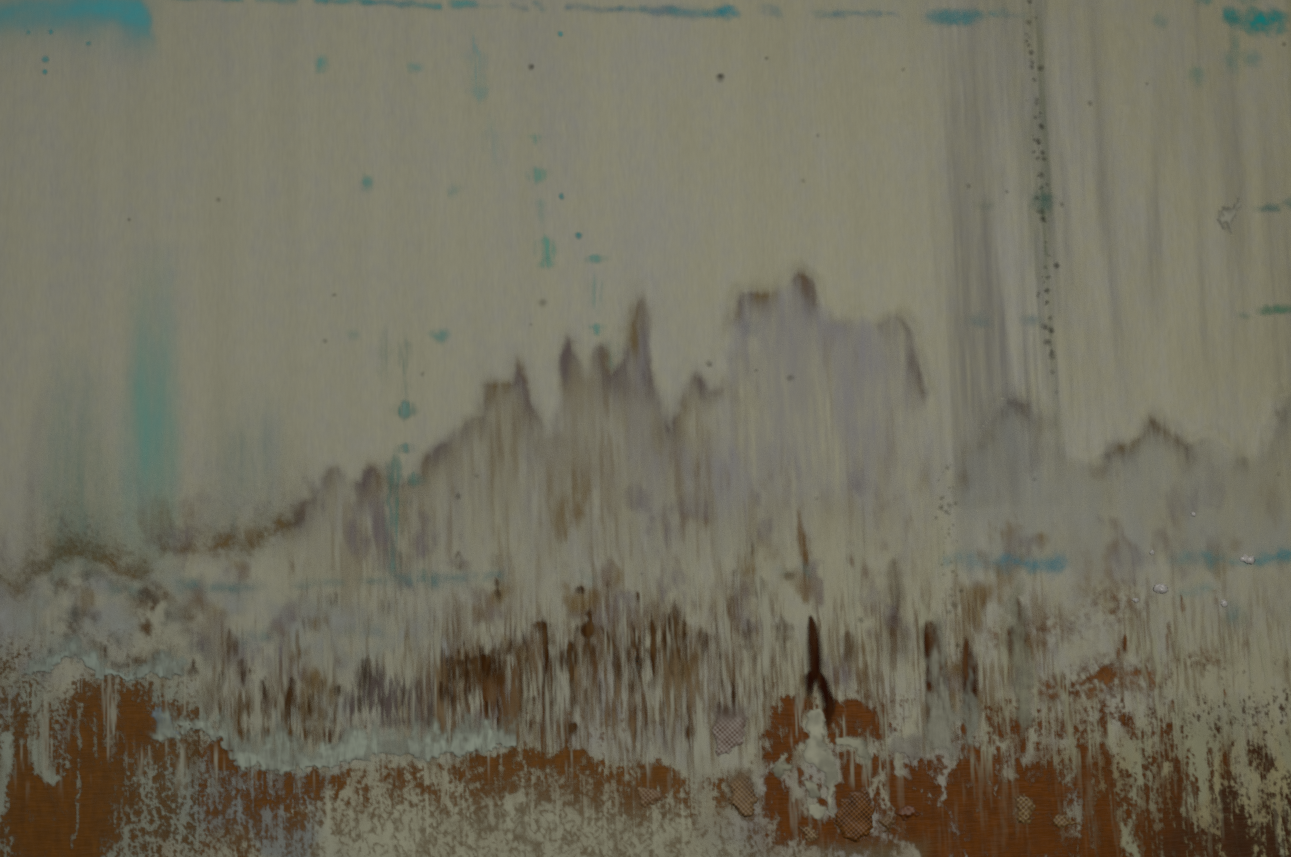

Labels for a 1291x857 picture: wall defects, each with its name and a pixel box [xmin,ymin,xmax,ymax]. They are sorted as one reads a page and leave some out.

corrosion [219,681,307,742]
corrosion [338,611,699,753]
peeling [0,649,1291,857]
corrosion [718,685,735,714]
corrosion [805,616,834,723]